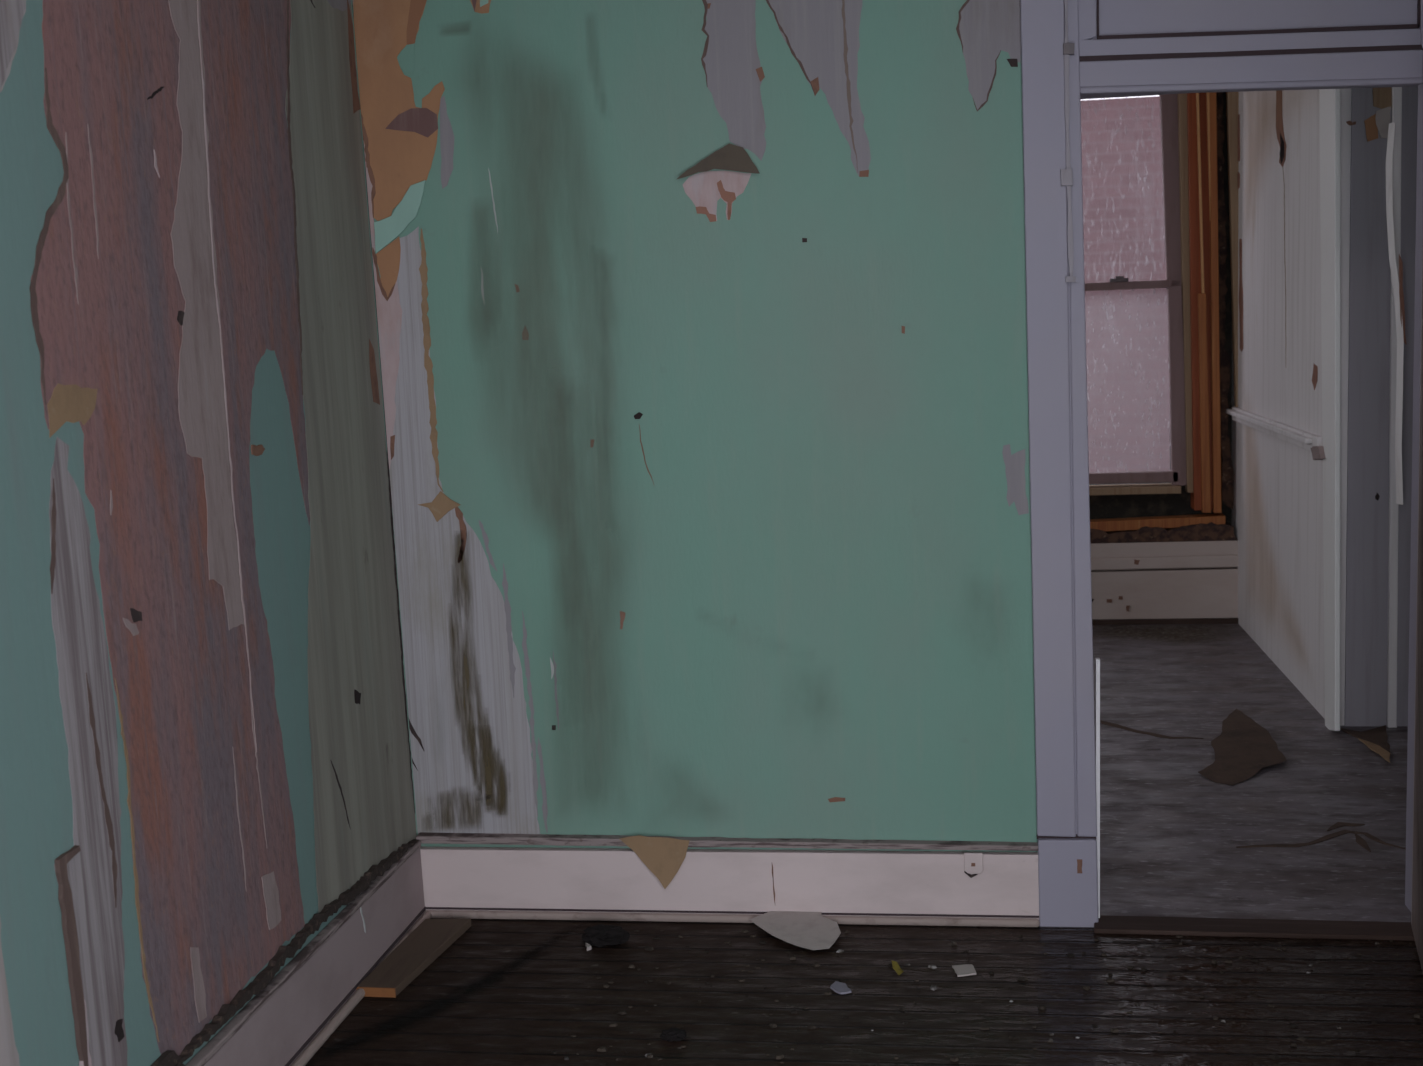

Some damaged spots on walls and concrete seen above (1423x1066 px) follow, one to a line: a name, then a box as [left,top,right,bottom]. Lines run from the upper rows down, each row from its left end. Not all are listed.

peeling [683,0,871,222]
peeling [956,0,1021,111]
peeling [0,0,548,1066]
water stain [441,535,505,828]